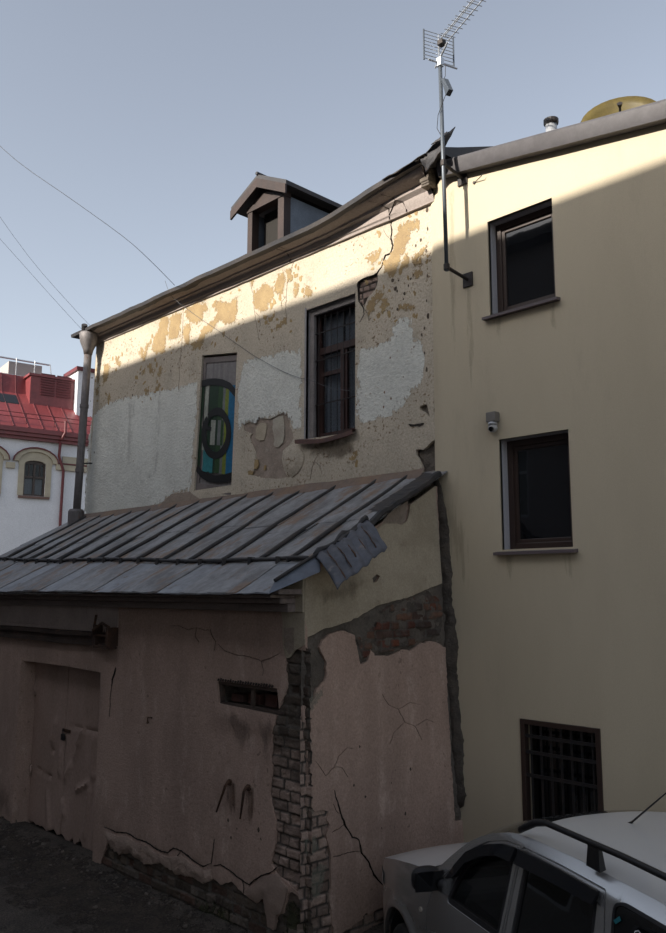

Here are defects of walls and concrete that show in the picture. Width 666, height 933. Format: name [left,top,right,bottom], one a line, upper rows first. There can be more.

crack [357,195,407,321]
peeling [359,207,431,336]
spalling [243,412,294,479]
flaking render [102,442,467,933]
crack [104,826,277,895]
crack [317,748,383,885]